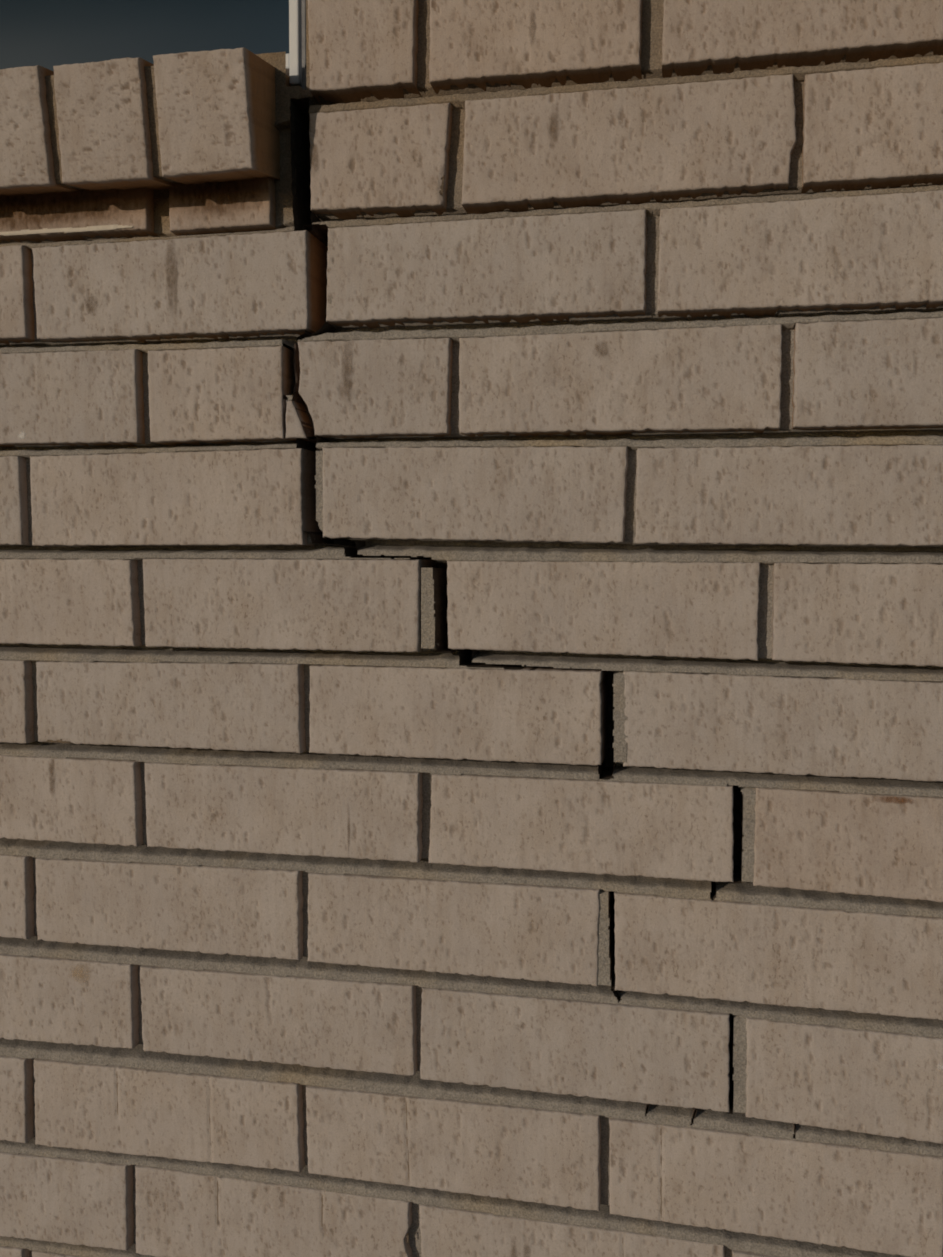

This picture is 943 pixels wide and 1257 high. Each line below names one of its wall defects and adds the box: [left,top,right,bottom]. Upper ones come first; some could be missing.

crack [290,98,329,247]
crack [296,322,336,341]
crack [283,392,329,452]
crack [304,526,617,779]
crack [710,784,743,899]
crack [608,891,622,1002]